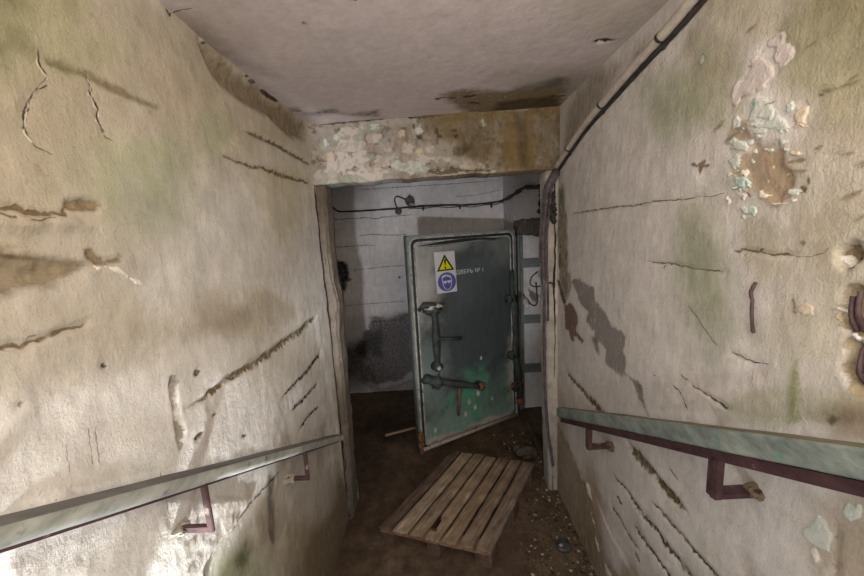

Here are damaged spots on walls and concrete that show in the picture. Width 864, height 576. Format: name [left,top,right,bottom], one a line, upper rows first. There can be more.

peeling [313,123,490,182]
damp [436,80,564,166]
peeling [718,31,810,219]
crack [0,204,66,221]
crack [0,325,82,350]
flaking render [0,245,142,294]
crack [185,132,405,496]
crack [553,217,604,412]
damp [557,189,642,401]
flaking render [835,284,864,397]
crack [612,447,719,576]
peeling [801,503,864,576]